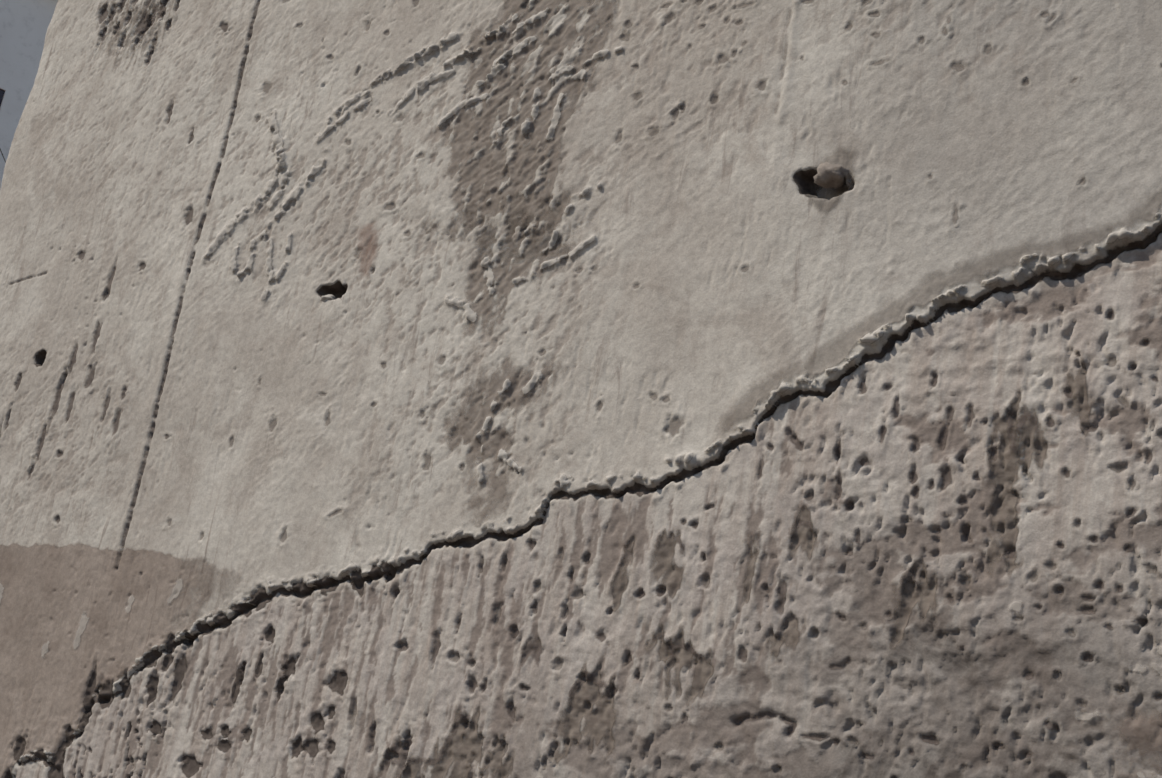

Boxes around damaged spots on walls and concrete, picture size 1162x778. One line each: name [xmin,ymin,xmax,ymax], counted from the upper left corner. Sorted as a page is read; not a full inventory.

spalling [29,322,103,477]
peeling [447,349,556,517]
crack [5,212,1162,778]
spalling [608,519,698,614]
spalling [789,492,816,559]
spalling [910,454,964,498]
spalling [967,397,1056,581]
spalling [1064,352,1099,436]
spalling [369,707,513,778]
spalling [432,632,487,692]
spalling [543,663,618,770]
spalling [644,624,713,721]